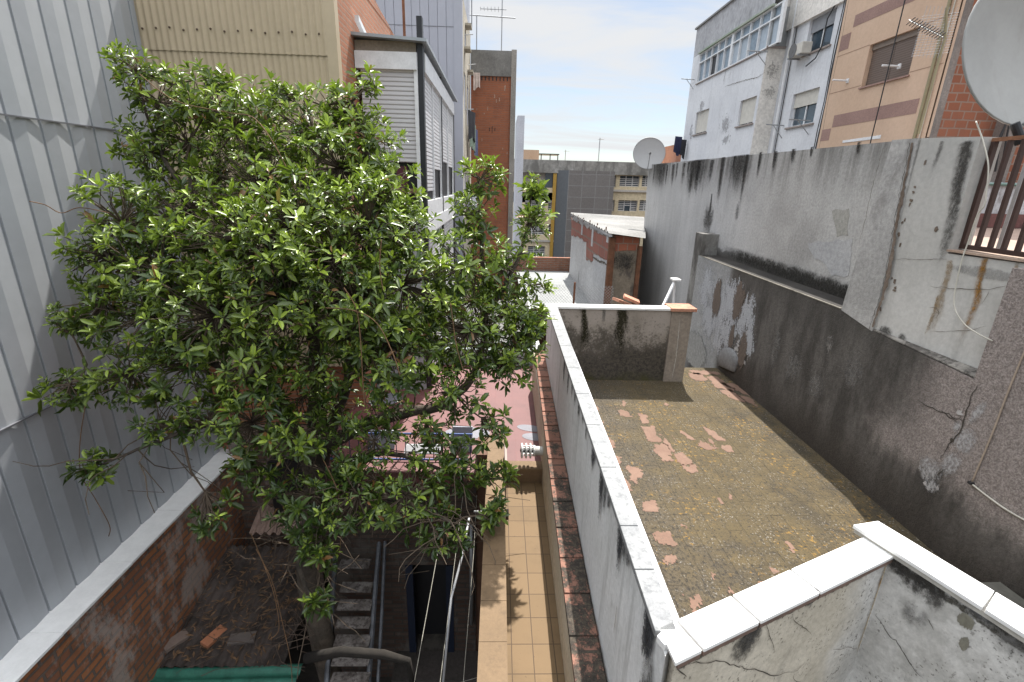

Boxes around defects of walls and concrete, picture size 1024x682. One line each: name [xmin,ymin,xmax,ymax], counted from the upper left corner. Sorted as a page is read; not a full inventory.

damp [653,151,778,231]
damp [944,141,971,248]
corrosion [967,260,986,324]
damp [615,310,628,348]
peeling [688,266,758,407]
peeling [608,437,643,491]
peeling [653,430,734,473]
crack [919,387,977,481]
damp [617,527,629,566]
peeling [652,524,688,565]
damp [641,609,654,682]
crack [678,660,798,682]